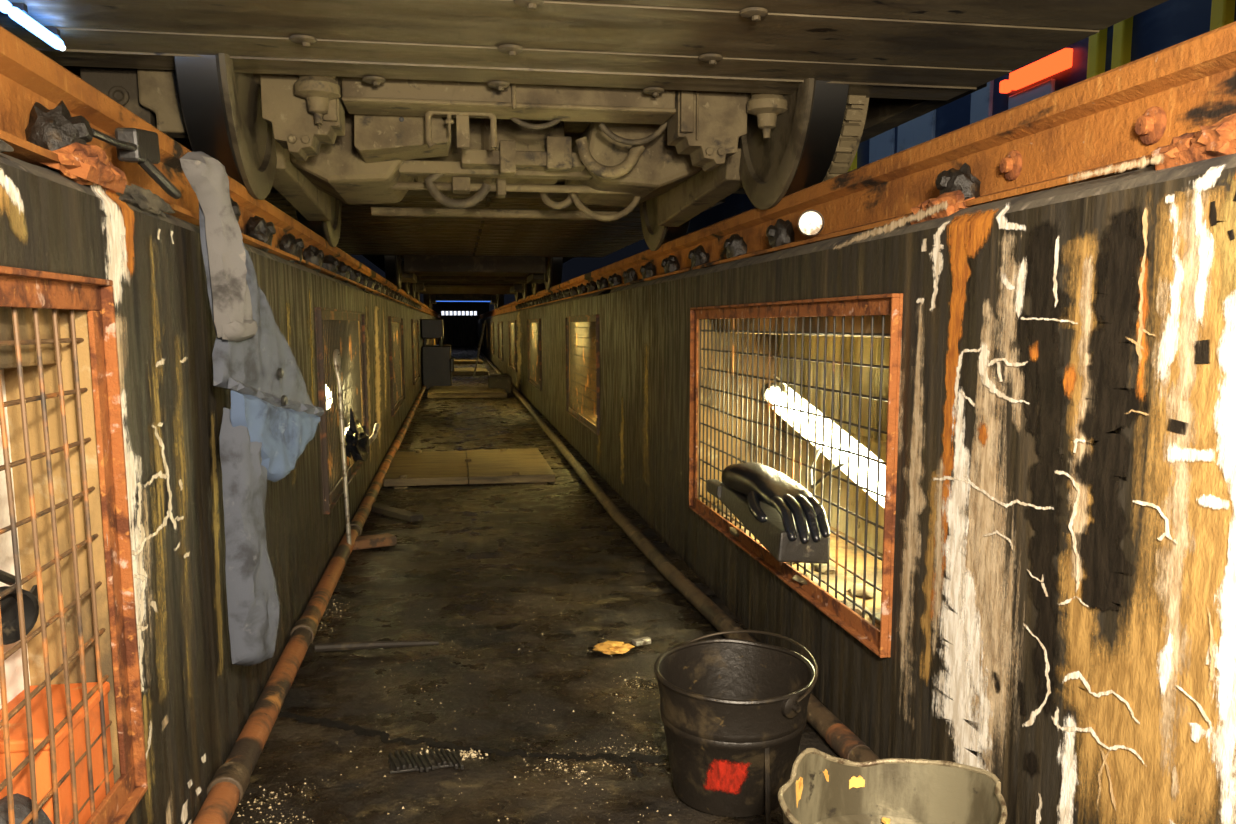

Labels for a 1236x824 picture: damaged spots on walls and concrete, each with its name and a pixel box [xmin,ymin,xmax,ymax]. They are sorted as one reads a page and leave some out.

water stain [91,184,202,824]
crack [132,425,184,631]
corrosion [930,209,998,621]
crack [954,343,1029,408]
crack [933,438,1089,607]
corrosion [1030,342,1039,361]
water stain [898,165,1236,824]
corrosion [1063,366,1076,398]
crack [1133,500,1177,544]
crack [1022,624,1144,810]
crack [1176,612,1214,730]